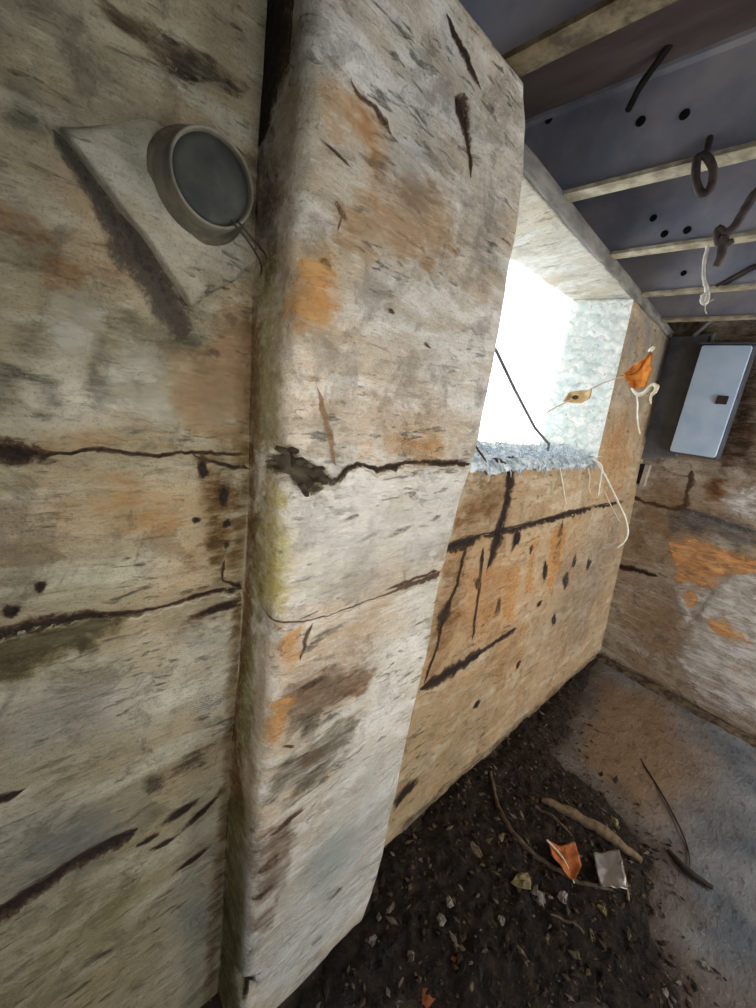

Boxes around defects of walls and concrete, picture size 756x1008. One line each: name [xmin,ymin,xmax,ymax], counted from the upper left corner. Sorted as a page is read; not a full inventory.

crack [0,437,471,490]
spalling [266,445,329,497]
crack [0,455,623,690]